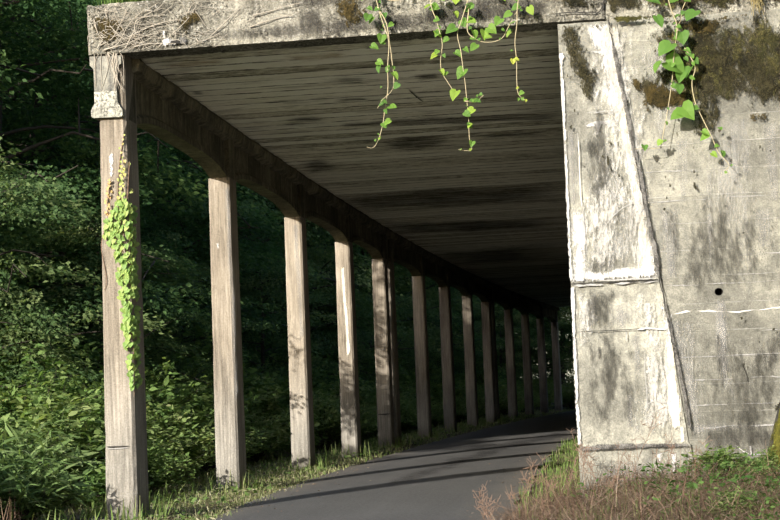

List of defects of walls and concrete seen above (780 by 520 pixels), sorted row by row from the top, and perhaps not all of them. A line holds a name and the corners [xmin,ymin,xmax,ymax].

crack [555,0,614,46]
damp [570,24,655,282]
damp [689,199,755,289]
damp [576,292,613,333]
damp [590,338,630,419]
damp [638,294,685,443]
damp [711,336,776,454]